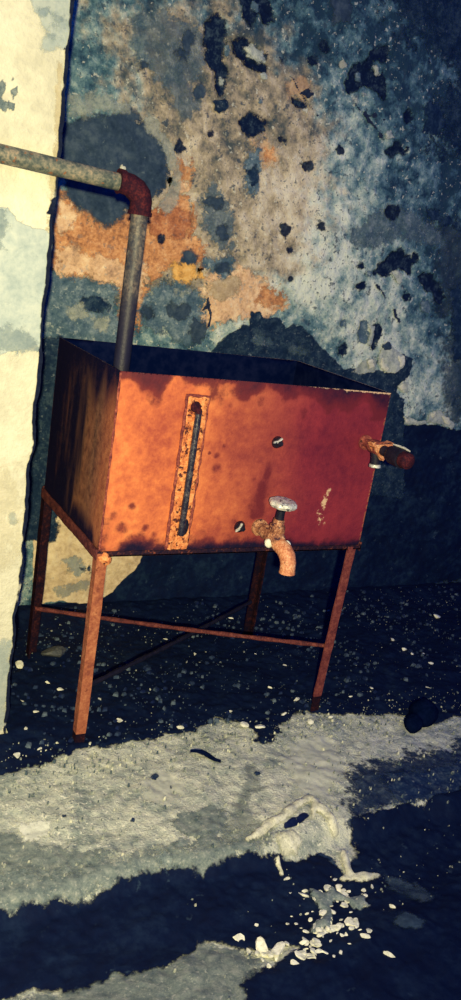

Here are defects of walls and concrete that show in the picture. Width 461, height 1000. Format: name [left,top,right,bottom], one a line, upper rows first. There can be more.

damp [50,175,130,229]
corrosion [50,186,131,318]
damp [53,63,182,213]
damp [130,9,206,121]
damp [179,182,236,280]
corrosion [134,158,290,330]
damp [242,142,263,199]
damp [377,0,461,163]
damp [102,204,461,602]
damp [0,769,271,915]
damp [280,732,461,829]
damp [7,942,262,1000]